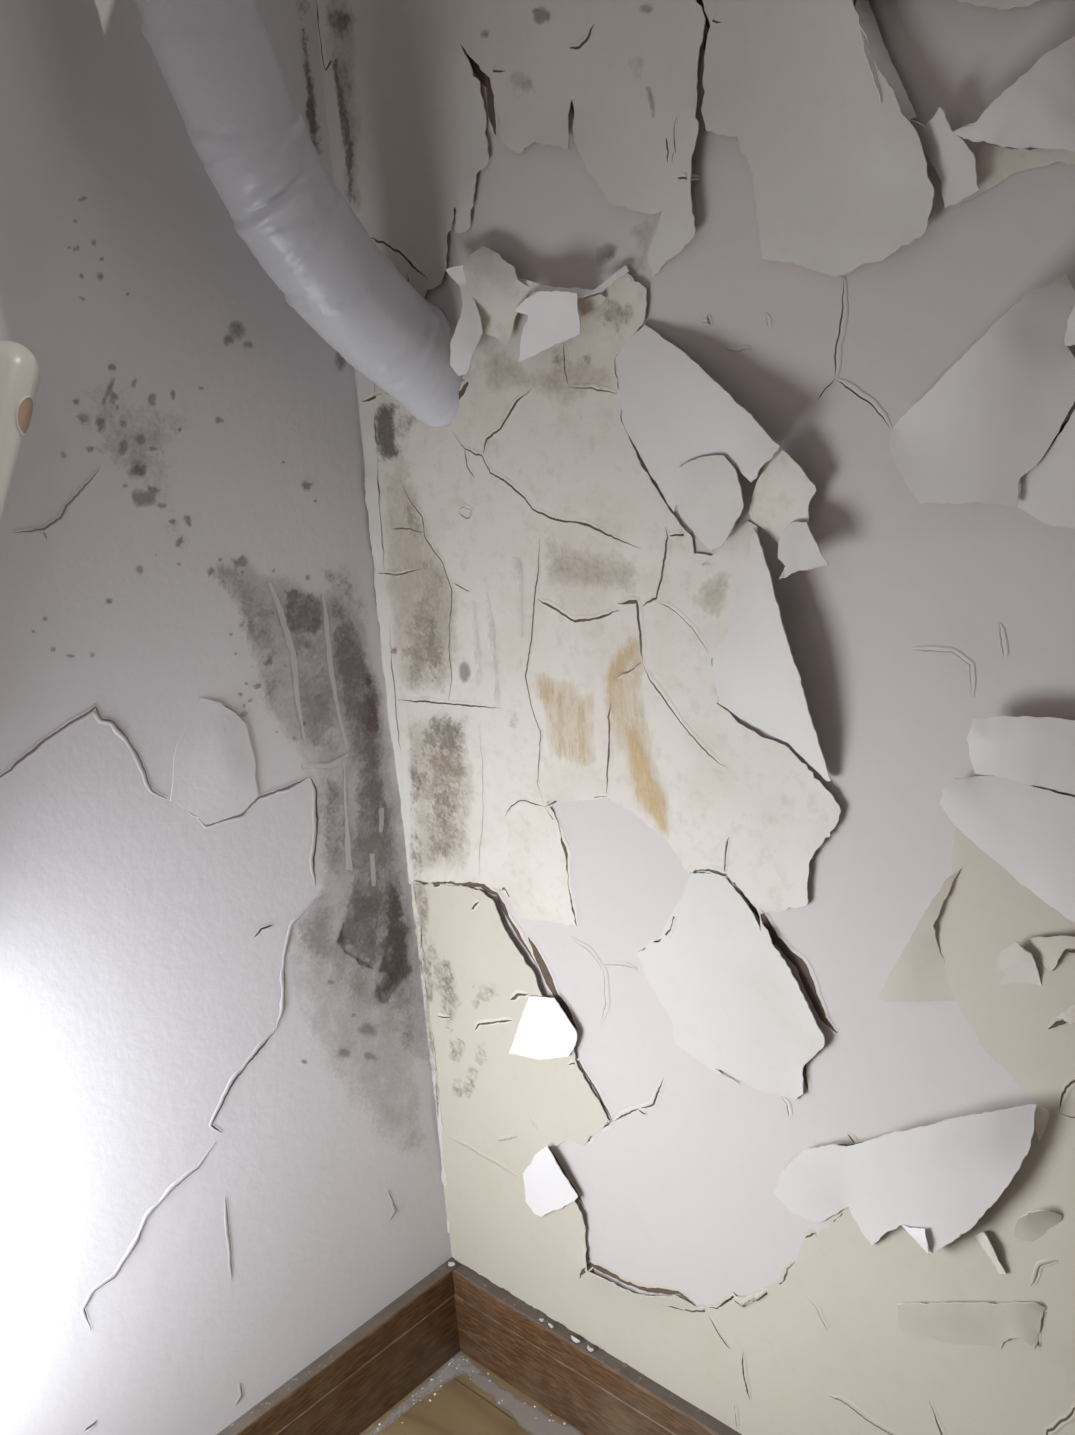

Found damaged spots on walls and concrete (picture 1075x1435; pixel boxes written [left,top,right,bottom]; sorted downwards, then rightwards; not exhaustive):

water stain [306,65,316,145]
water stain [334,65,352,190]
water stain [376,404,411,458]
water stain [124,467,190,546]
water stain [460,664,469,681]
peeling [317,0,1075,1435]
water stain [262,575,430,1002]
crack [0,702,320,1331]
crack [235,1381,244,1406]
crack [829,1394,899,1435]
crack [927,1400,948,1435]
crack [1044,1403,1075,1435]